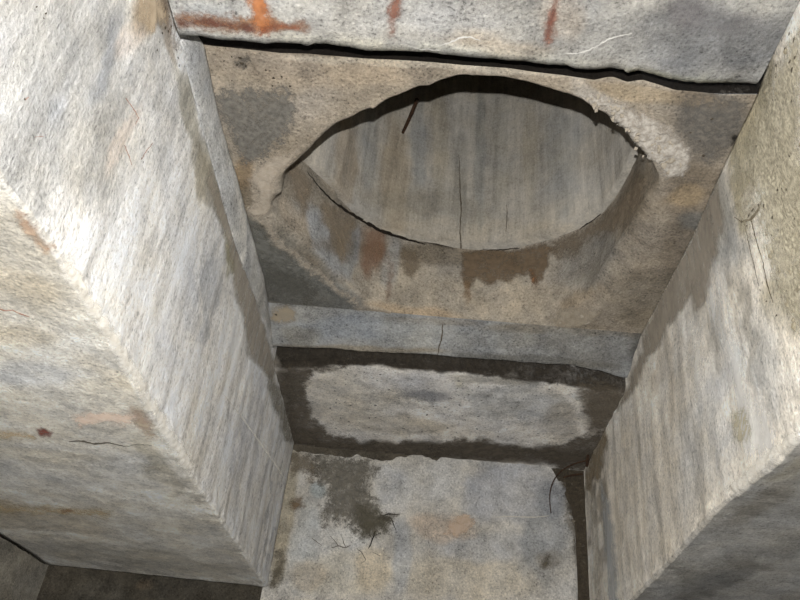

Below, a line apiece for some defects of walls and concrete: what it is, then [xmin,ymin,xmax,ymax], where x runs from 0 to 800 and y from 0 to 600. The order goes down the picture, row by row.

rust [176,0,308,33]
rust [387,0,400,33]
rust [545,0,557,44]
leakage [215,67,296,164]
spalling [578,89,690,178]
leakage [208,168,722,600]
crack [69,439,151,447]